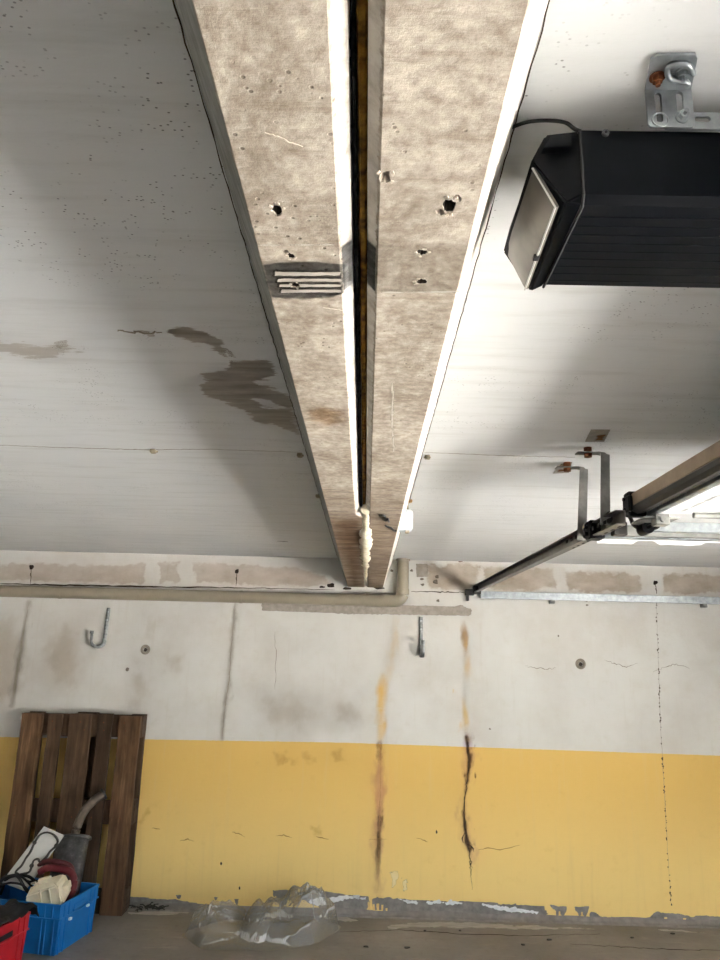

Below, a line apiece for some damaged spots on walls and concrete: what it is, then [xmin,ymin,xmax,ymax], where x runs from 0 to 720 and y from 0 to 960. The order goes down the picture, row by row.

peeling [416,564,428,577]
crack [608,603,688,906]
peeling [302,891,601,917]
peeling [647,911,720,920]